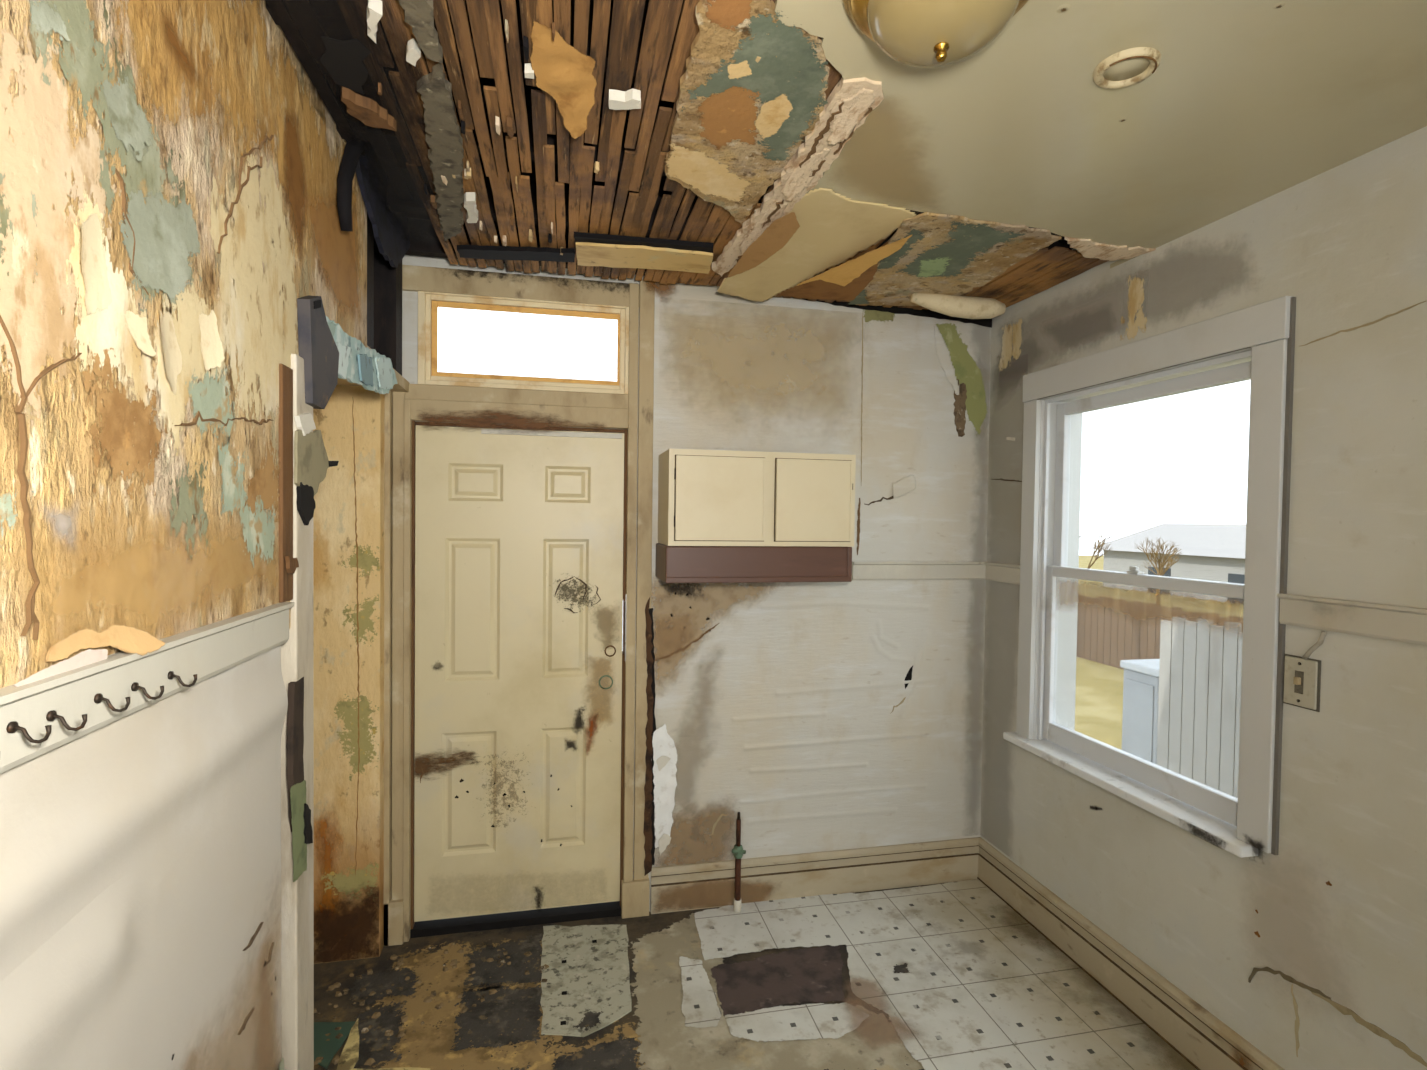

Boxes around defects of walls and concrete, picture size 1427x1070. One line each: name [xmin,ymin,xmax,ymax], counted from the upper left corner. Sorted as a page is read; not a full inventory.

crack [218,135,274,253]
spalling [712,77,884,277]
peeling [0,0,339,574]
crack [175,411,273,426]
peeling [326,316,398,394]
peeling [863,310,895,322]
peeling [934,323,988,437]
crack [0,315,82,640]
water stain [651,583,765,683]
water stain [314,819,379,964]
water stain [659,808,734,866]
crack [1248,967,1427,1067]